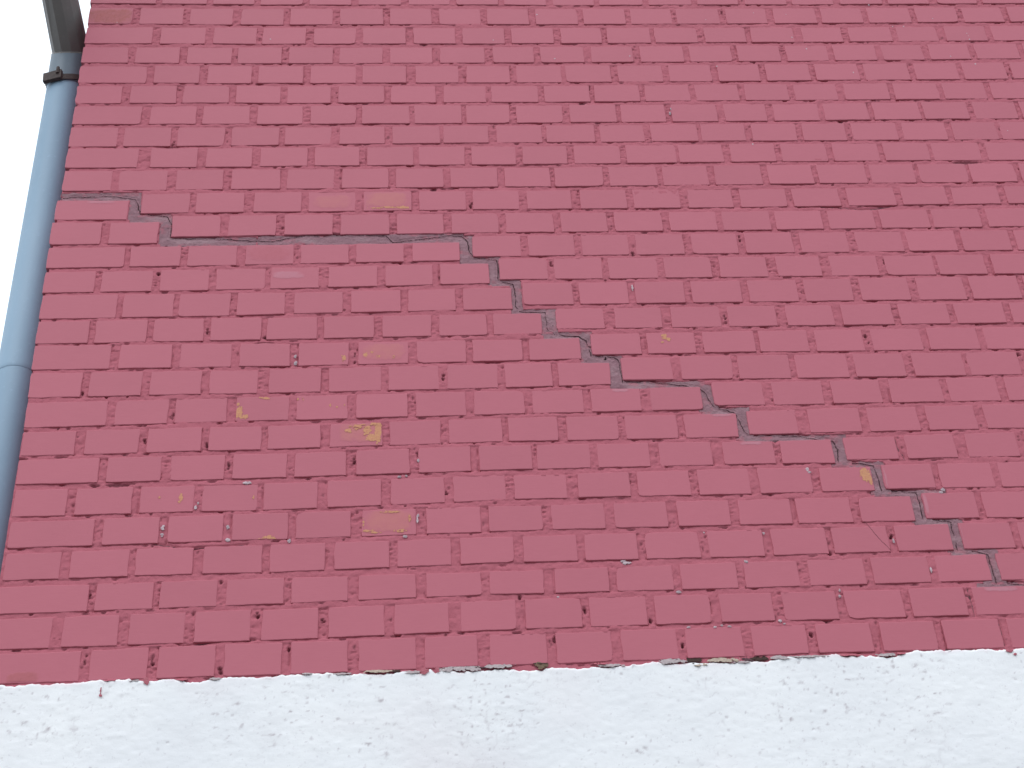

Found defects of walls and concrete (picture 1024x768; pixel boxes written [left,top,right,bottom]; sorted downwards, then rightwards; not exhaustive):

peeling [344,423,382,445]
crack [60,193,1024,616]